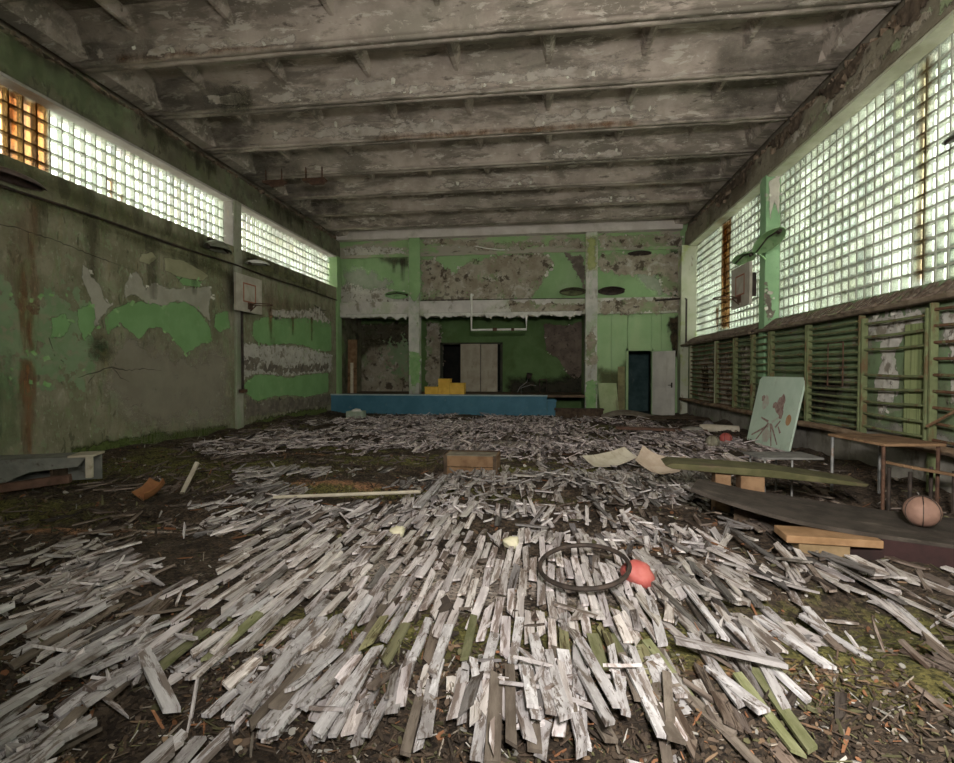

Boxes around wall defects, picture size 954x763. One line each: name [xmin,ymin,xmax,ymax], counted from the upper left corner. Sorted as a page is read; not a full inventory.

peeling [769,176,782,218]
peeling [0,265,232,403]
peeling [244,306,333,402]
flaking render [341,238,585,391]
peeling [585,379,597,408]
flaking render [584,332,599,368]
flaking render [598,250,679,315]
corrosion [716,218,732,330]
flaking render [868,307,925,418]
flaking render [940,309,954,363]